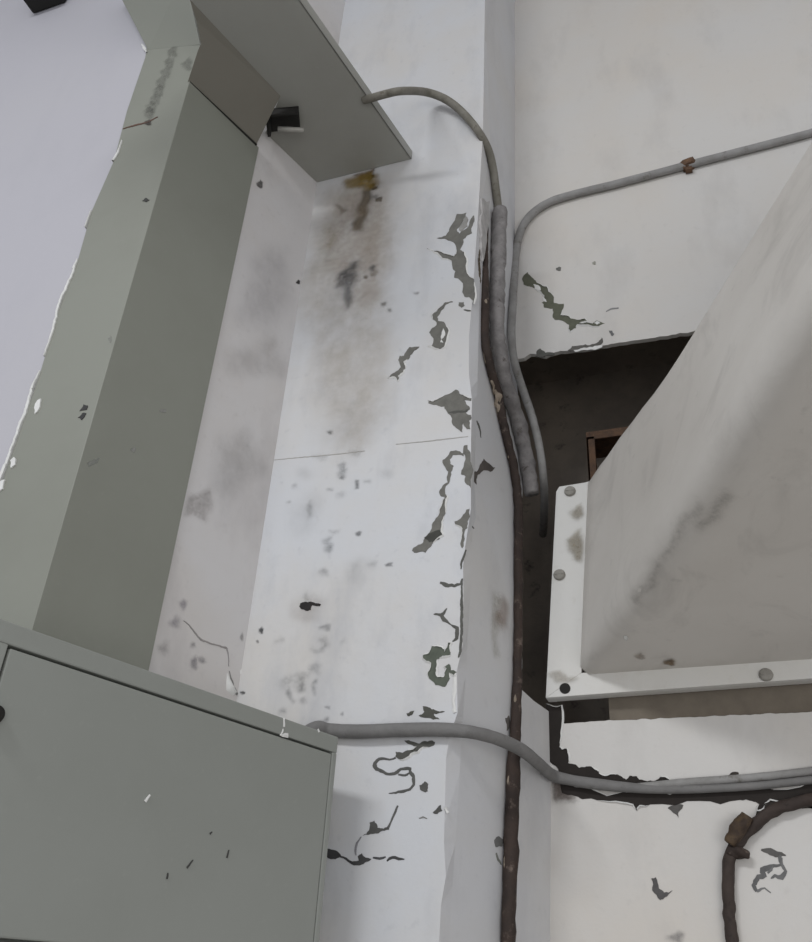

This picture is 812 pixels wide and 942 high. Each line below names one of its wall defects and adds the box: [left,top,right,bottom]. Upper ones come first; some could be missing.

rust [346,169,374,188]
leakage [353,189,382,230]
leakage [339,263,374,300]
peeling [387,198,490,382]
peeling [522,272,619,352]
peeling [428,390,481,437]
peeling [412,445,495,553]
crack [184,621,229,667]
peeling [406,641,457,720]
flaking render [546,704,812,816]
peeling [327,740,435,865]
peeling [651,877,671,900]